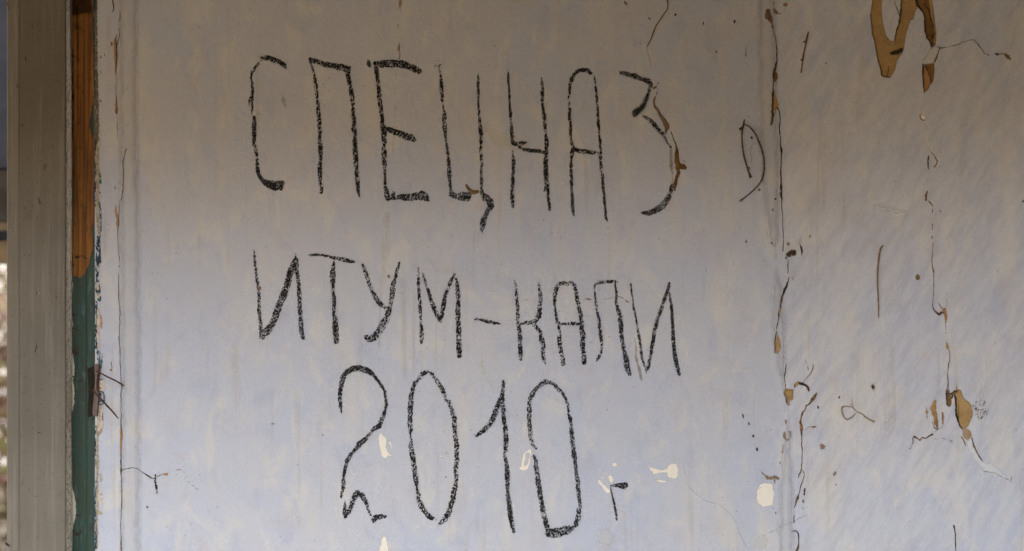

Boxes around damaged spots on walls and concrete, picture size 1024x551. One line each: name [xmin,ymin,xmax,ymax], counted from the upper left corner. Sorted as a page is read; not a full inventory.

peeling [870,0,936,78]
peeling [922,63,934,93]
crack [934,40,1011,63]
crack [683,25,817,551]
crack [909,151,954,450]
peeling [942,387,1012,481]
peeling [649,464,678,483]
peeling [757,483,774,507]